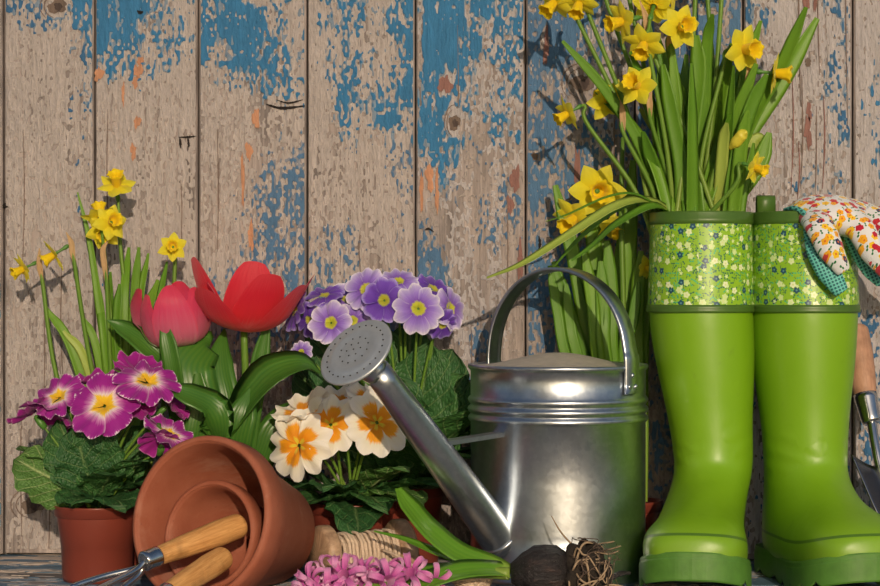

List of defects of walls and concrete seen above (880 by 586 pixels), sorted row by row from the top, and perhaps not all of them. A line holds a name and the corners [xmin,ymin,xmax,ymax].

peeling [669,0,880,212]
peeling [0,0,691,586]
peeling [858,268,880,411]
peeling [639,379,791,586]
peeling [848,404,880,511]